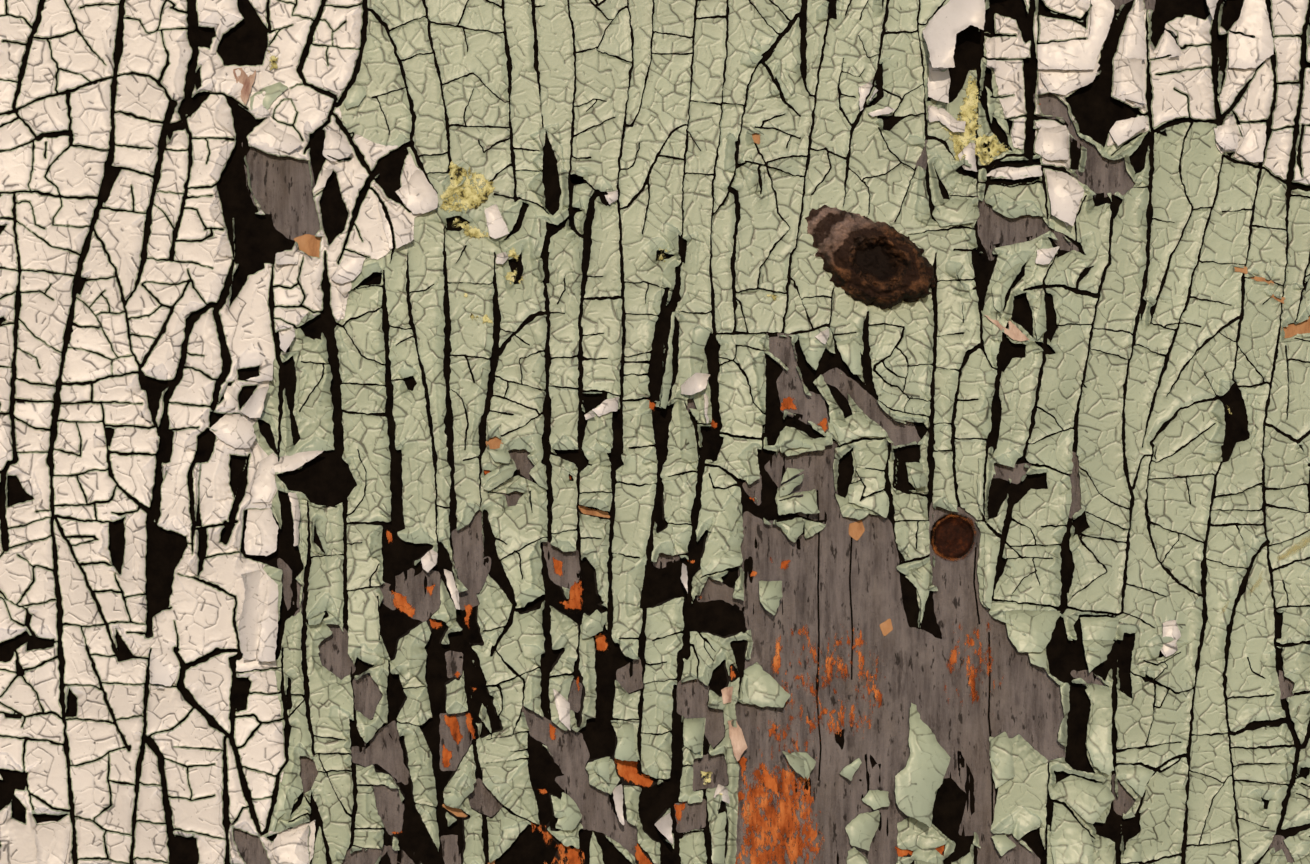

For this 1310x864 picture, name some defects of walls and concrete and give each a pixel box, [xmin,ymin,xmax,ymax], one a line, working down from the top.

peeling [164,0,353,305]
peeling [373,147,470,249]
peeling [484,132,618,284]
peeling [916,0,1274,374]
peeling [142,374,175,464]
crack [266,0,1310,864]
peeling [1215,379,1250,464]
peeling [108,517,125,574]
peeling [147,295,1154,864]
corrosion [944,623,1001,704]
corrosion [735,626,886,864]
corrosion [531,823,585,864]